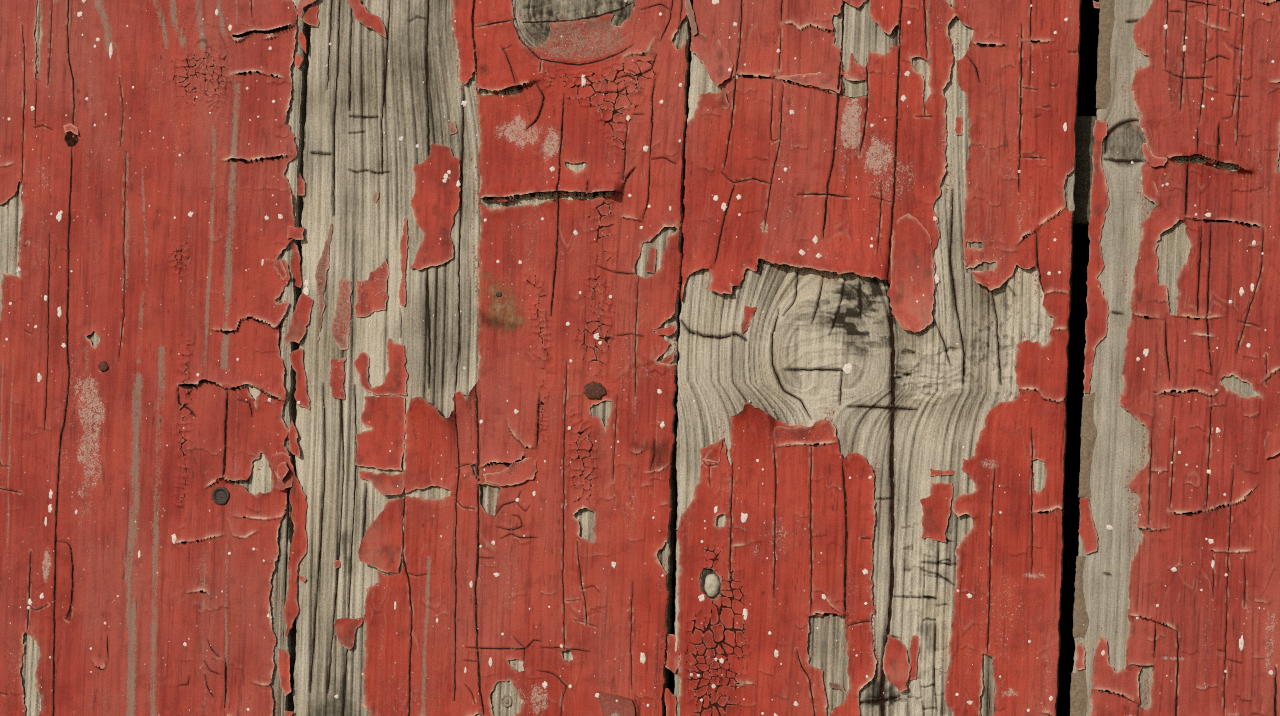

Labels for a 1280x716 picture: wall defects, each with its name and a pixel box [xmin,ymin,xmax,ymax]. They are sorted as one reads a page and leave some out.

peeling [0,182,23,319]
crack [172,0,292,107]
peeling [218,0,635,716]
crack [682,0,954,716]
peeling [653,0,1060,716]
peeling [1064,0,1244,716]
crack [1104,0,1280,716]